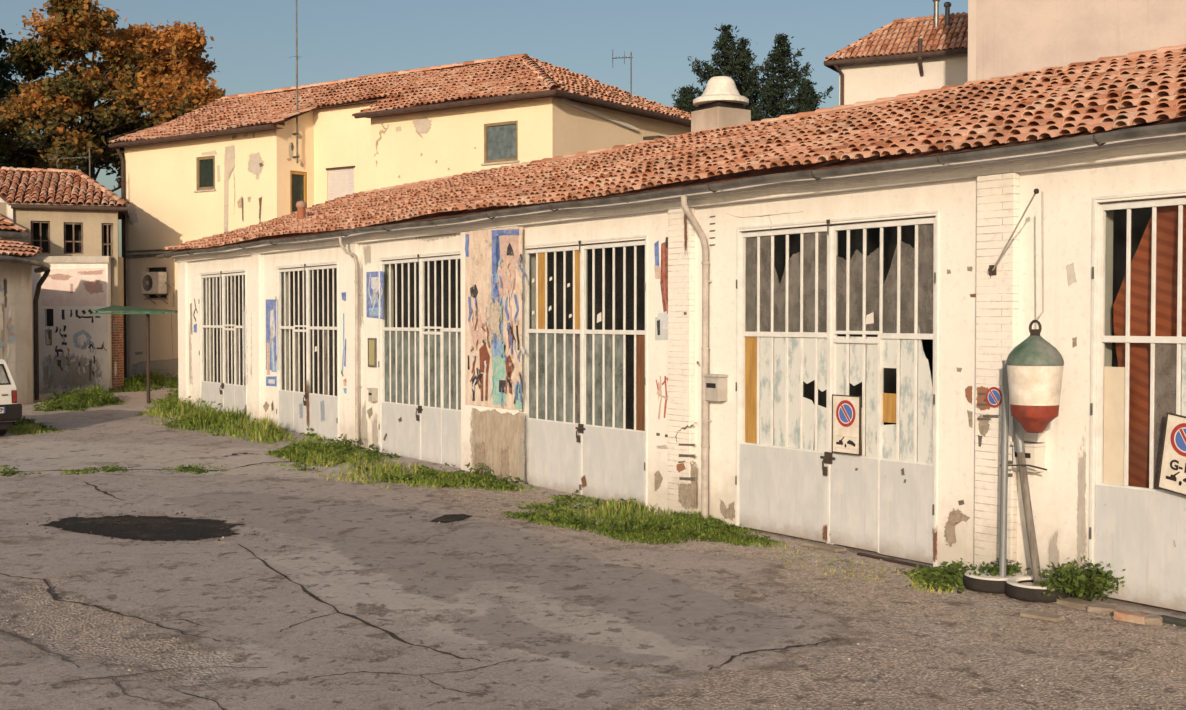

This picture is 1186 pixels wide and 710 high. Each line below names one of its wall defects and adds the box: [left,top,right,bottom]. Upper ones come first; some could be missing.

peeling [396,117,432,138]
peeling [202,132,255,182]
peeling [247,152,264,180]
spalling [965,386,991,447]